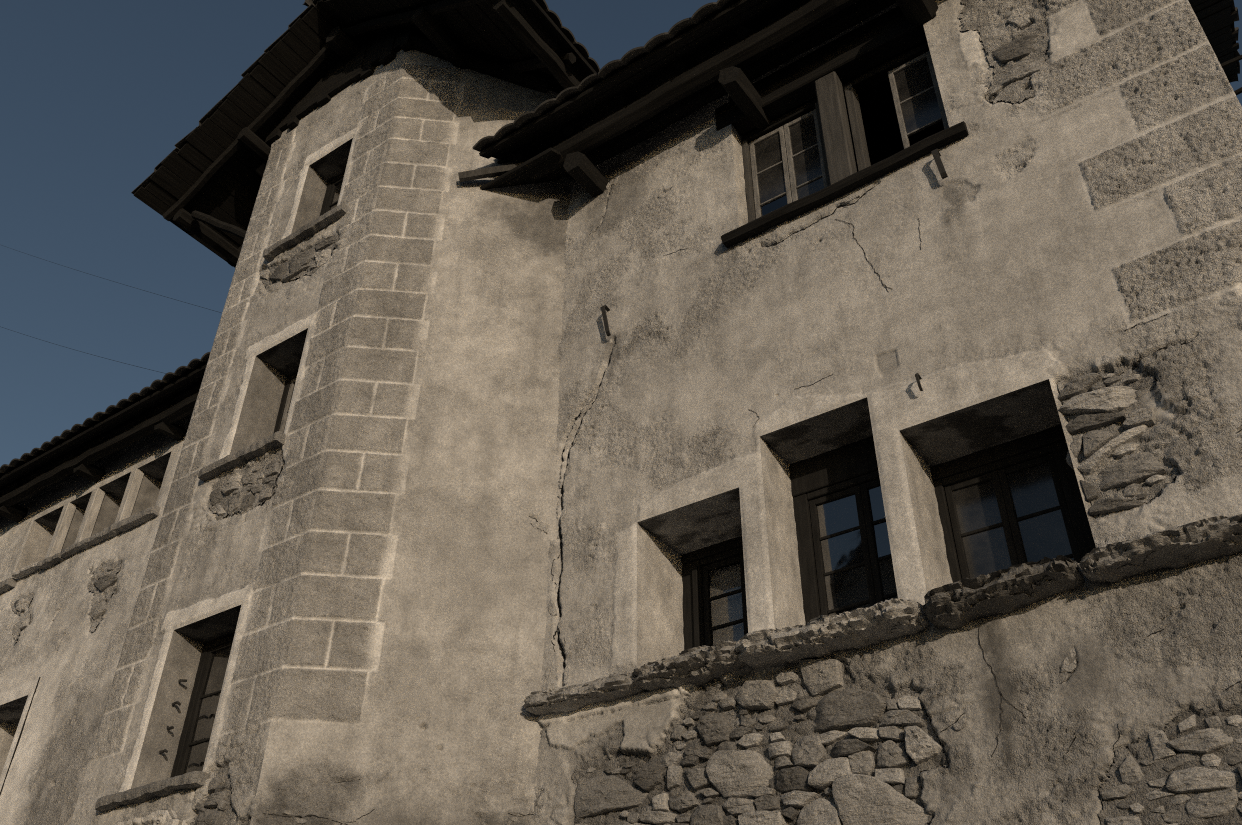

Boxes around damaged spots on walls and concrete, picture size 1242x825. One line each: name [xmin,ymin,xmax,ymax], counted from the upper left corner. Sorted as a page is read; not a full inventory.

spalling [958,0,1048,104]
spalling [259,234,339,287]
crack [766,184,892,291]
spalling [207,451,284,520]
crack [529,341,616,684]
spalling [1057,363,1180,518]